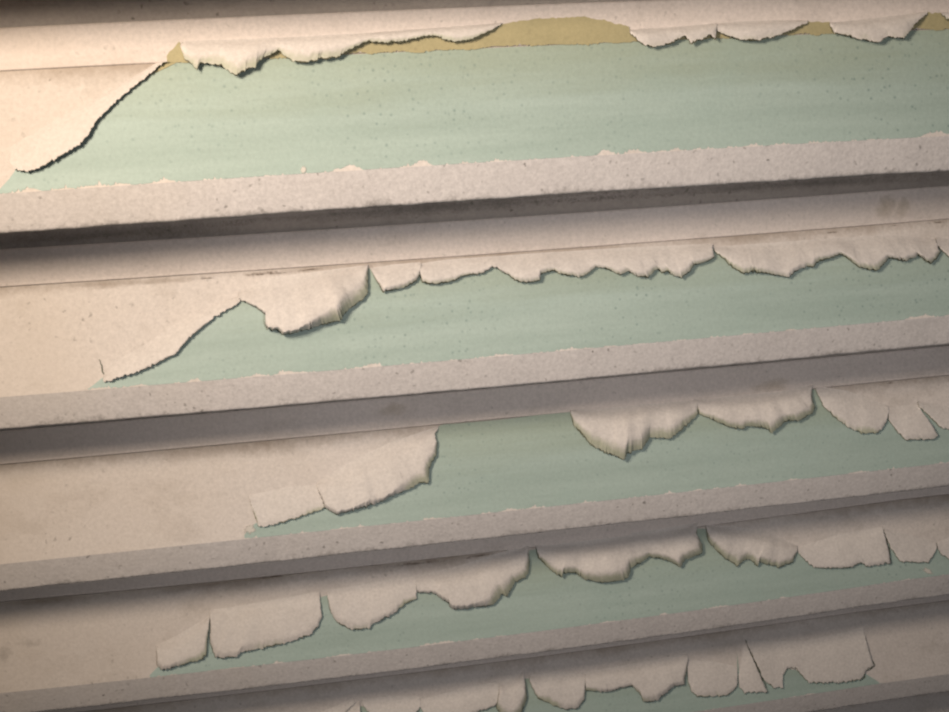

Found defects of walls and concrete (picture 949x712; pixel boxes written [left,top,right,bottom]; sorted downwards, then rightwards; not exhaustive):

peeling [0,11,949,194]
peeling [88,235,949,390]
peeling [244,385,949,538]
peeling [150,523,949,677]
peeling [323,627,881,712]